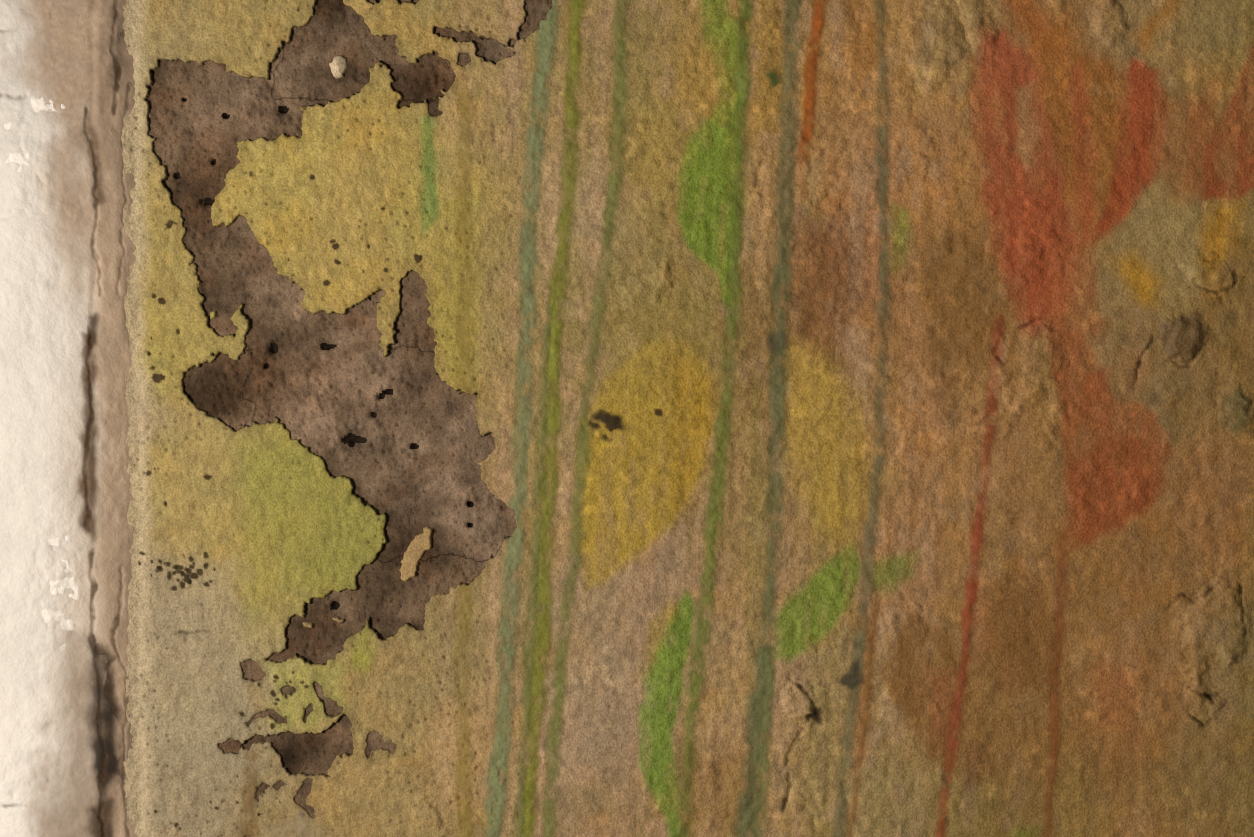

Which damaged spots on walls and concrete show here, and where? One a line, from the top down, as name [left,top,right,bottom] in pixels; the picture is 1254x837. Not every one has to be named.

crack [86,61,121,114]
crack [86,387,94,451]
spalling [138,0,553,820]